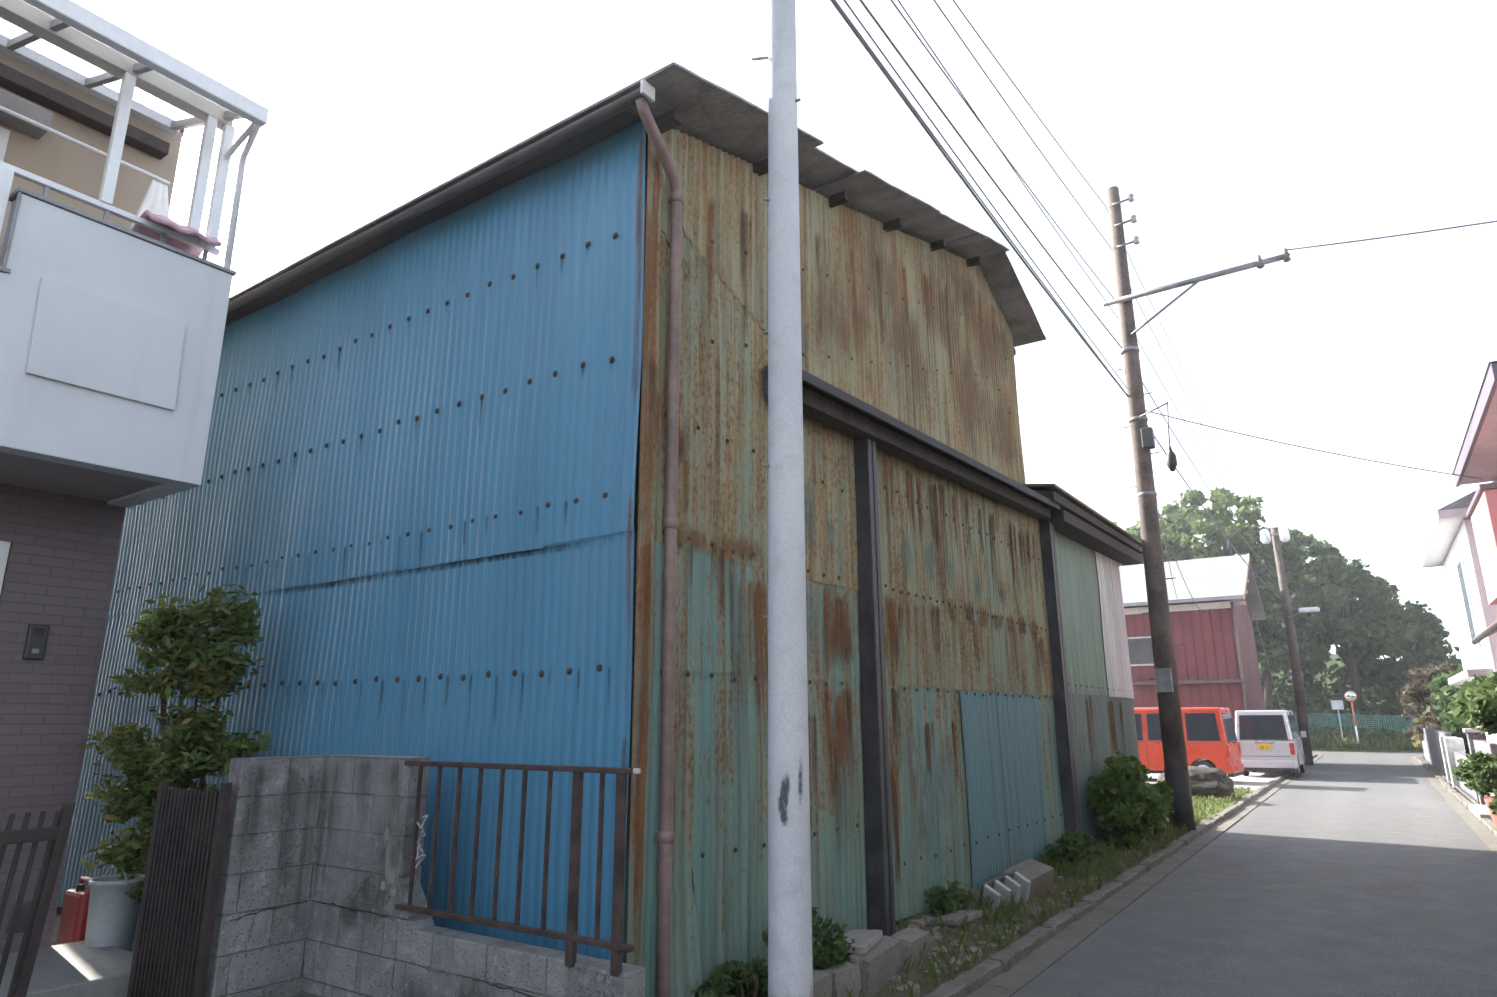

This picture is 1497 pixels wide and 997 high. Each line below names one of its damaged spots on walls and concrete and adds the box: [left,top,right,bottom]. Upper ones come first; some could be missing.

rust [636,141,658,332]
rust [902,269,1008,375]
rust [636,365,689,511]
rust [883,458,1037,587]
rust [622,500,652,884]
rust [677,530,768,694]
rust [808,689,854,803]
rust [825,588,852,668]
rust [891,690,900,877]
rust [918,723,933,769]
rust [883,601,1045,663]